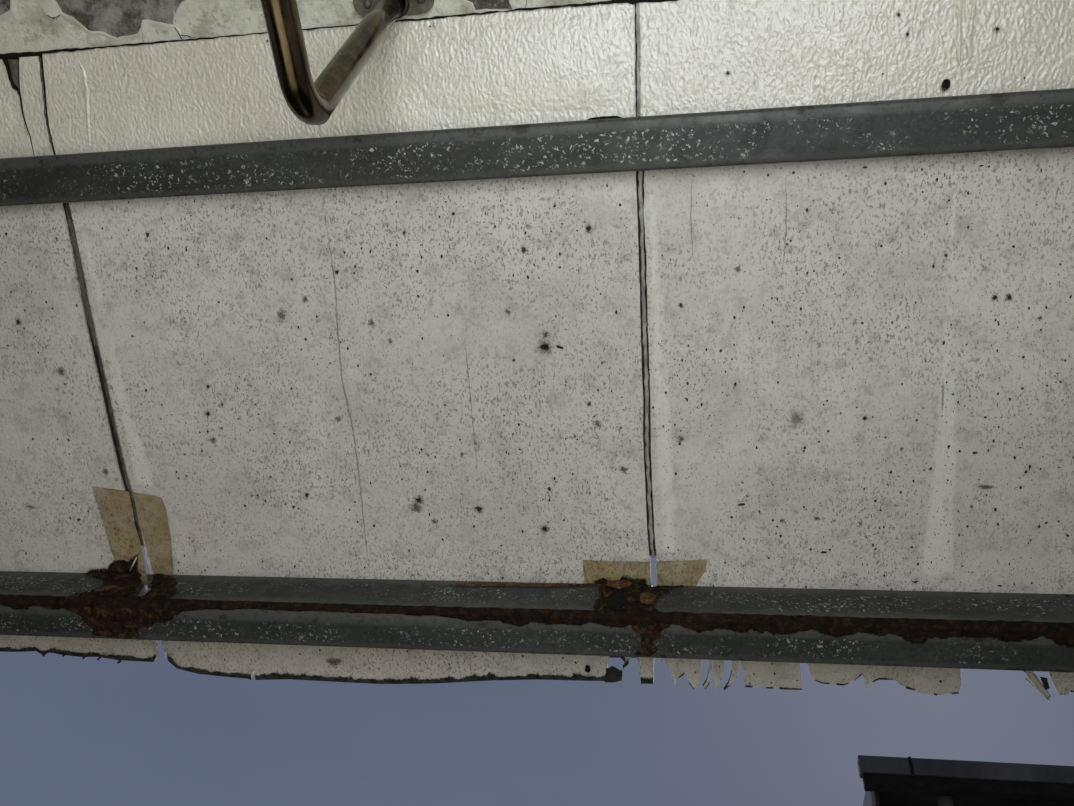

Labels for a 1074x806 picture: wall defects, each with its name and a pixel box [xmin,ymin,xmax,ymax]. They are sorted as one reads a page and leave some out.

peeling [0,0,17,22]
peeling [34,0,199,44]
peeling [459,0,518,13]
corrosion [0,555,1074,658]